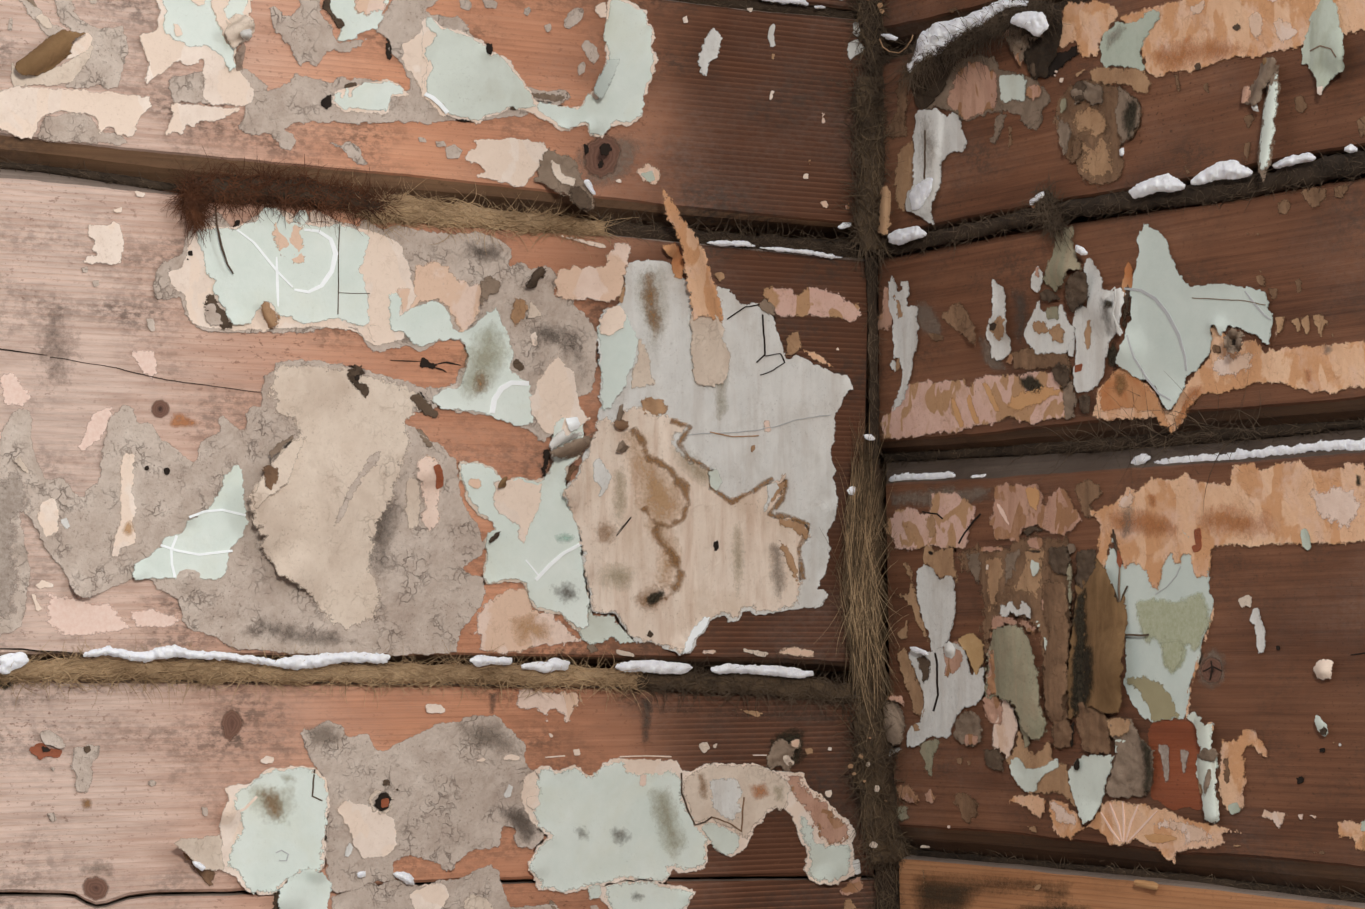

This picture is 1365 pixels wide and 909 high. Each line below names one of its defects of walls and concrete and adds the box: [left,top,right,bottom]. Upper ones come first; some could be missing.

peeling [1301,0,1345,95]
peeling [636,163,661,185]
peeling [82,207,124,287]
peeling [1031,266,1043,292]
peeling [986,279,1013,364]
peeling [1275,314,1334,337]
crack [0,348,262,393]
peeling [253,436,307,508]
peeling [1238,595,1266,654]
peeling [743,646,814,657]
peeling [1262,809,1316,828]
water stain [918,881,977,909]